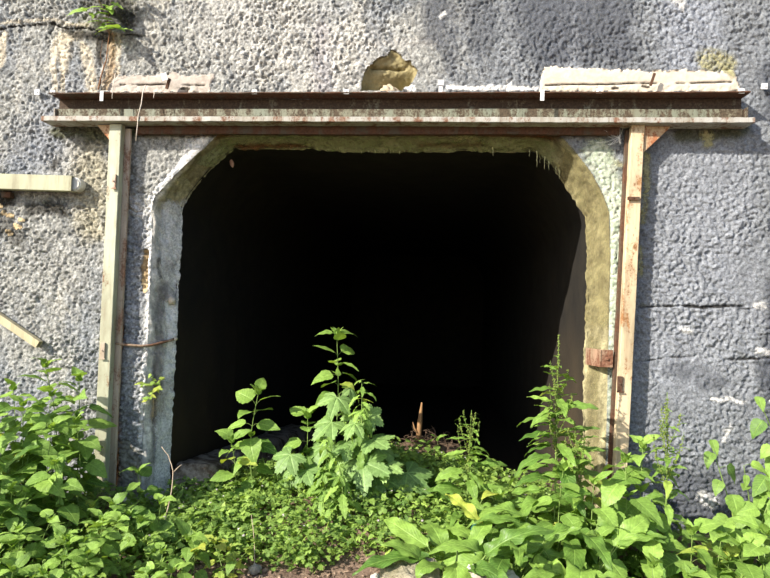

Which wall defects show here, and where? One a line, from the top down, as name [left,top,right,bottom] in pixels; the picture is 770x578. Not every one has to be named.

crack [0,21,139,49]
spalling [360,49,418,92]
peeling [0,204,25,236]
spalling [141,249,149,293]
crack [647,302,770,310]
crack [730,354,768,362]